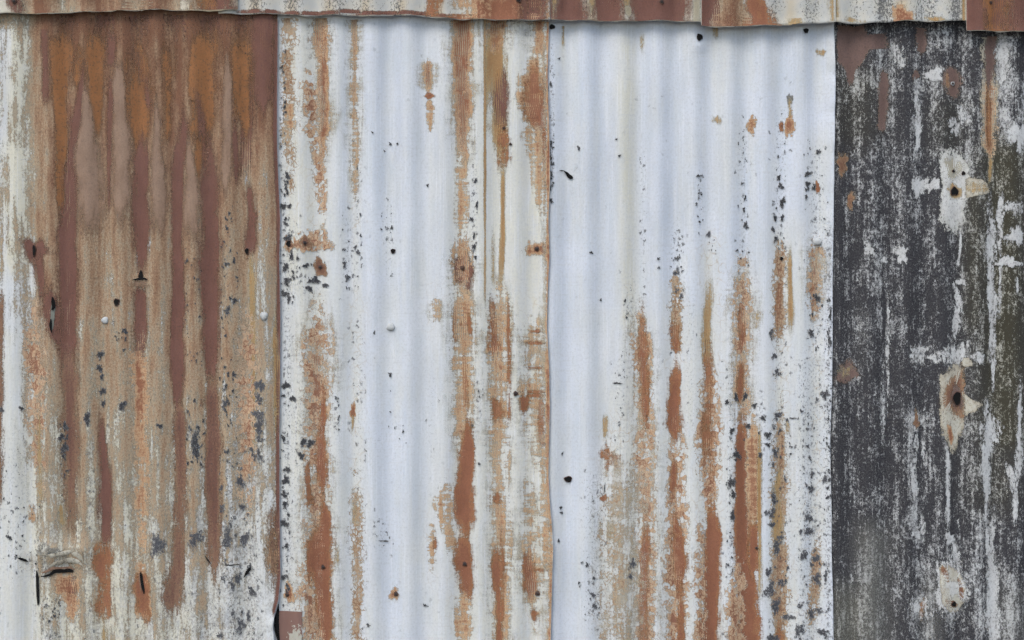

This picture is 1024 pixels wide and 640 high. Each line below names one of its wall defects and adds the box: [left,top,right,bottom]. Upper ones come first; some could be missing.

rust [942,66,965,99]
peeling [938,147,990,235]
rust [0,0,802,640]
peeling [939,357,983,454]
peeling [932,553,972,622]